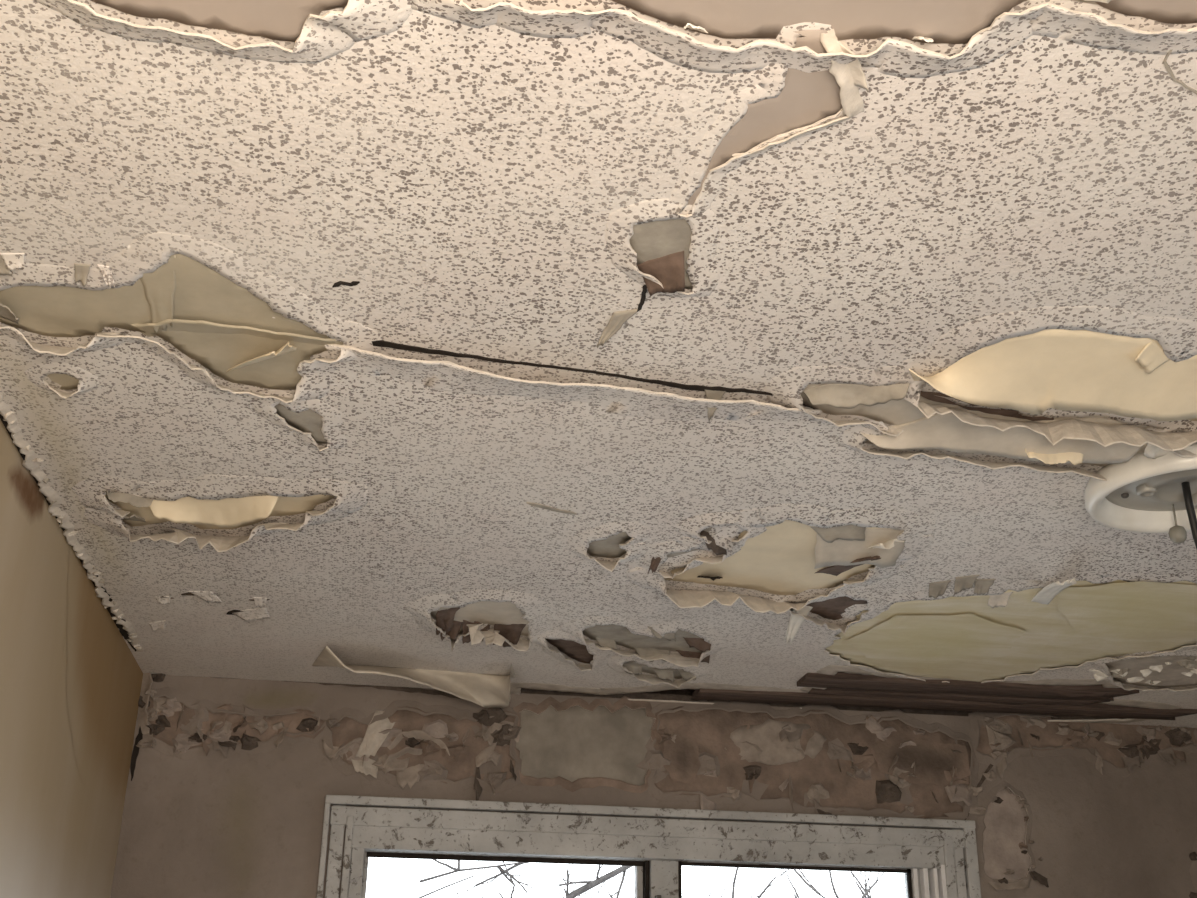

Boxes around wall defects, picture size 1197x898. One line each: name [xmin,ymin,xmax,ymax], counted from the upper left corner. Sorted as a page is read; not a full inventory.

peeling [33,0,1197,348]
peeling [0,231,383,452]
crack [325,340,822,432]
peeling [764,306,1197,481]
peeling [72,474,368,552]
peeling [137,504,1197,898]